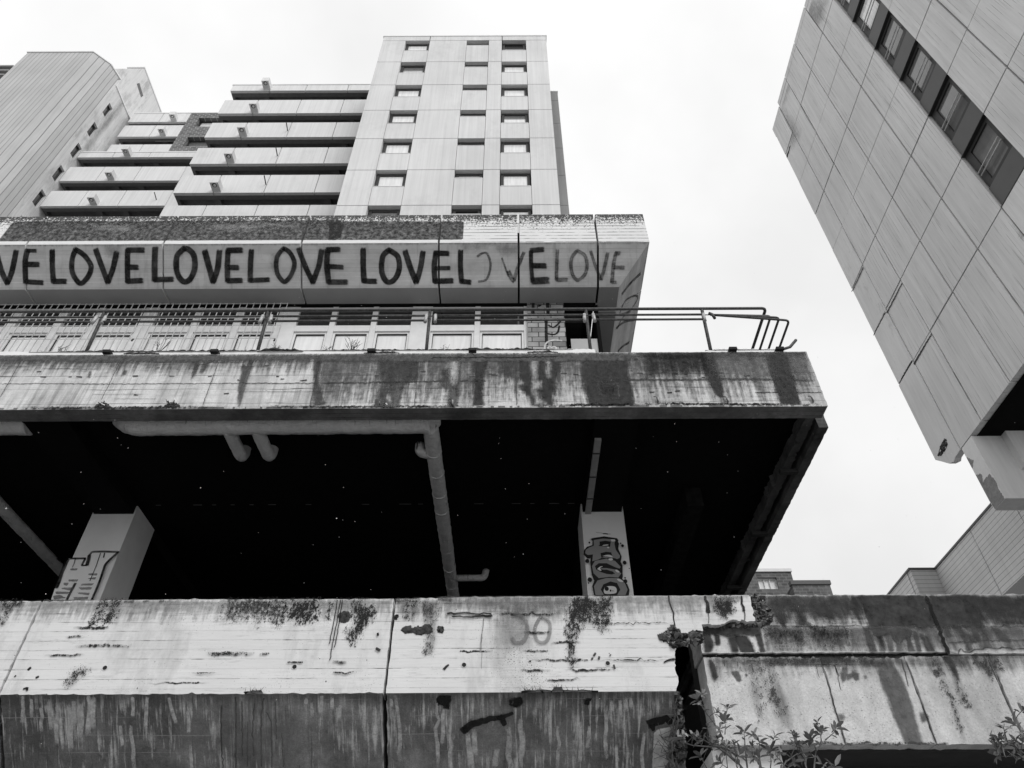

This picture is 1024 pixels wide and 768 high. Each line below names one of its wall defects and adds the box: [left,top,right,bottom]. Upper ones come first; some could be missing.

leakage [0,352,812,407]
leakage [0,598,176,638]
leakage [306,600,351,675]
leakage [703,594,1024,747]
leakage [304,699,341,718]
leakage [434,710,453,766]
leakage [466,732,478,766]
leakage [492,721,525,768]
leakage [603,699,633,753]
leakage [640,726,675,768]